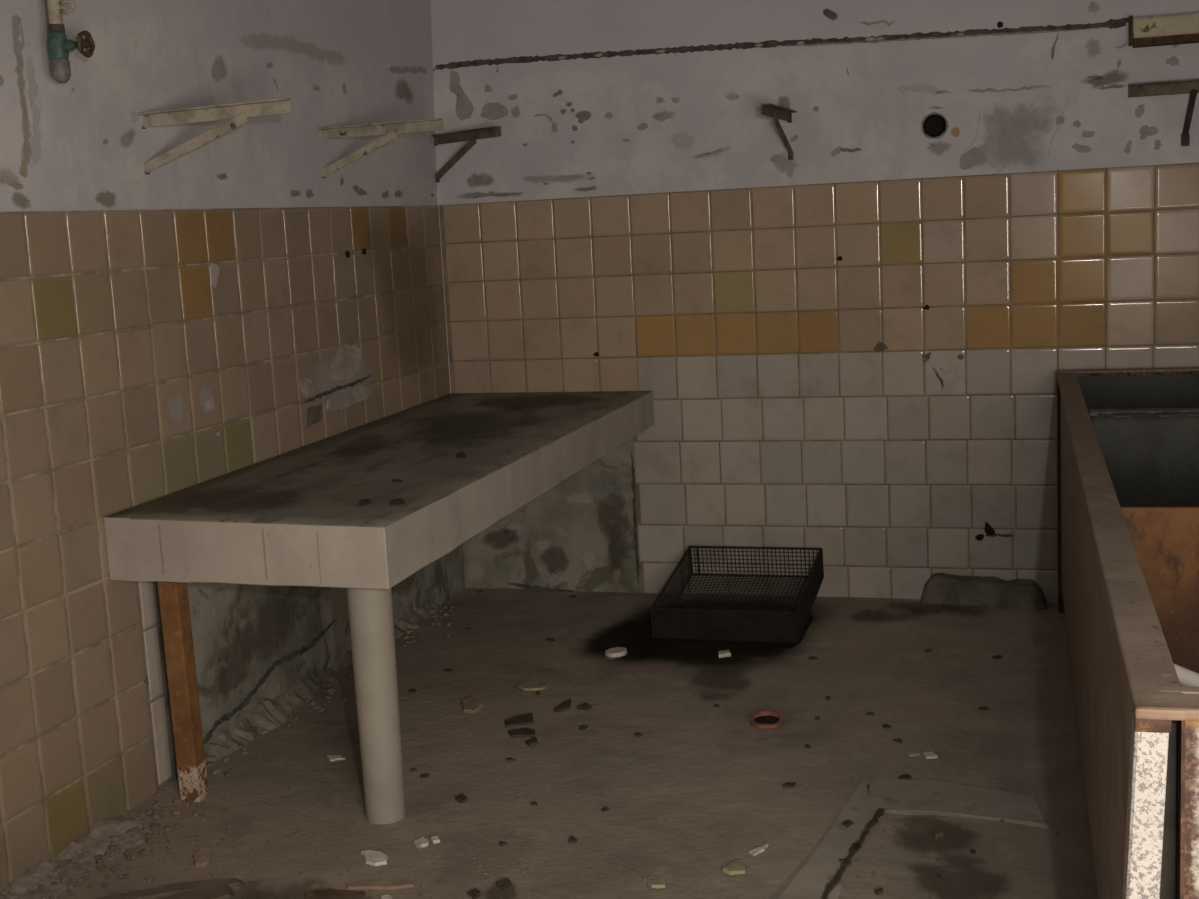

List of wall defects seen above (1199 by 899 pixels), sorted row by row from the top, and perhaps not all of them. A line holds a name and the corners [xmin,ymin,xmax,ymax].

peeling [449,70,613,144]
spalling [300,344,373,429]
damp [903,818,1003,899]